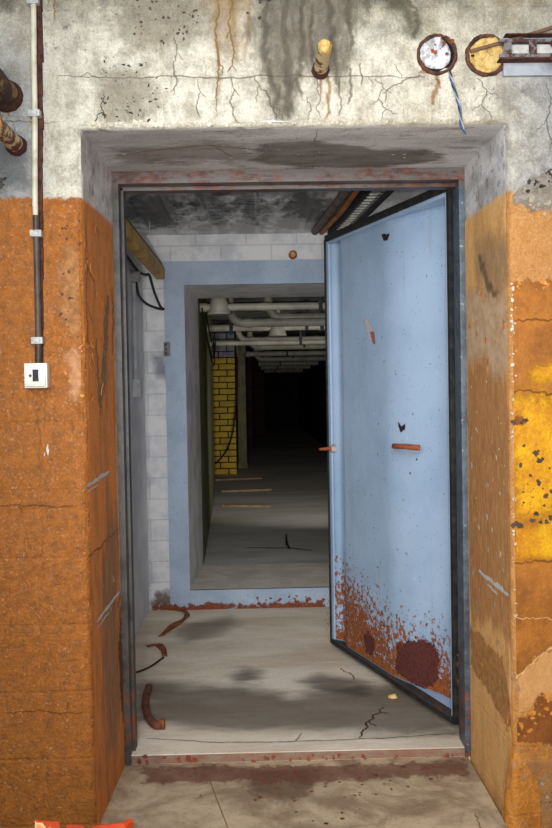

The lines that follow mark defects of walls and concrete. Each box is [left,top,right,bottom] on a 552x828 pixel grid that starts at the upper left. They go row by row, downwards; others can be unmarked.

leakage [247,0,354,116]
leakage [386,0,417,37]